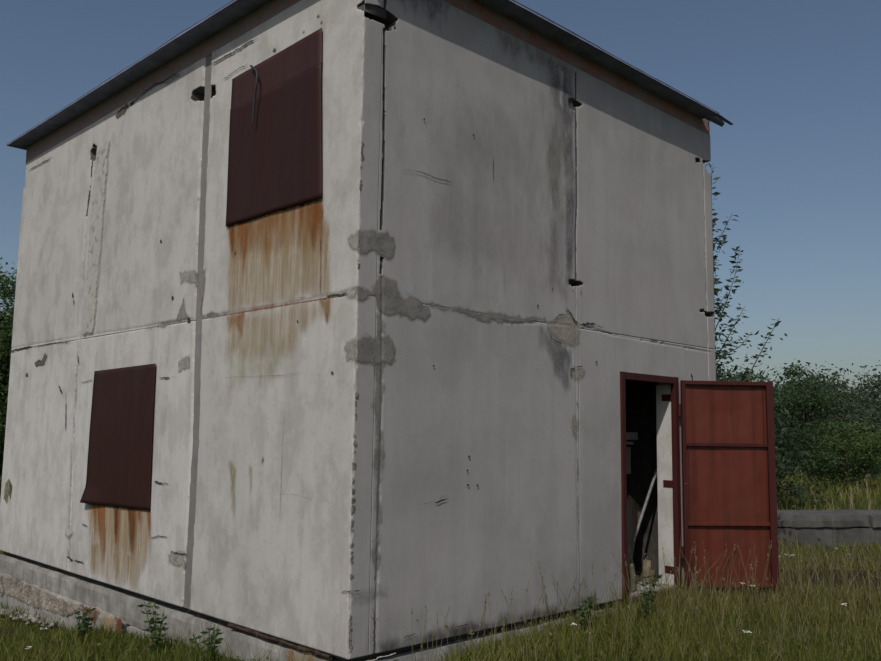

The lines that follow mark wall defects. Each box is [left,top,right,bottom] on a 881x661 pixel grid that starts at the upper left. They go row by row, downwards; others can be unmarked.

corrosion [229,200,329,333]
corrosion [90,504,150,569]